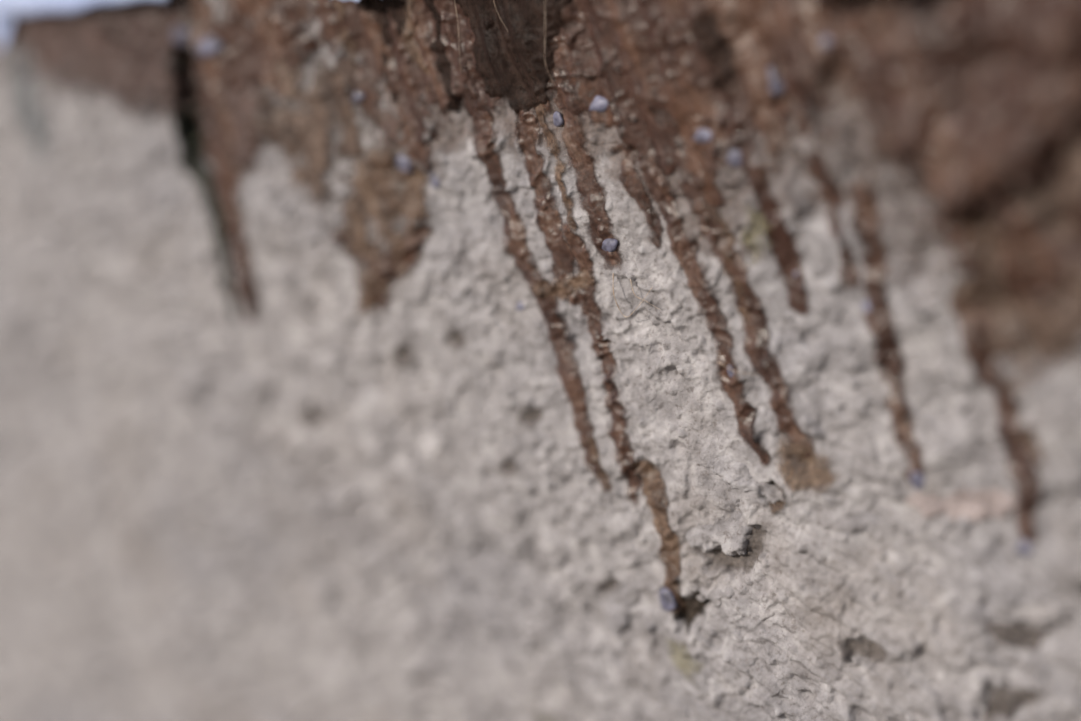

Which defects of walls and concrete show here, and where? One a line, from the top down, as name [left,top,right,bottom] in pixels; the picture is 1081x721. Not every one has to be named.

corrosion [770,440,834,514]